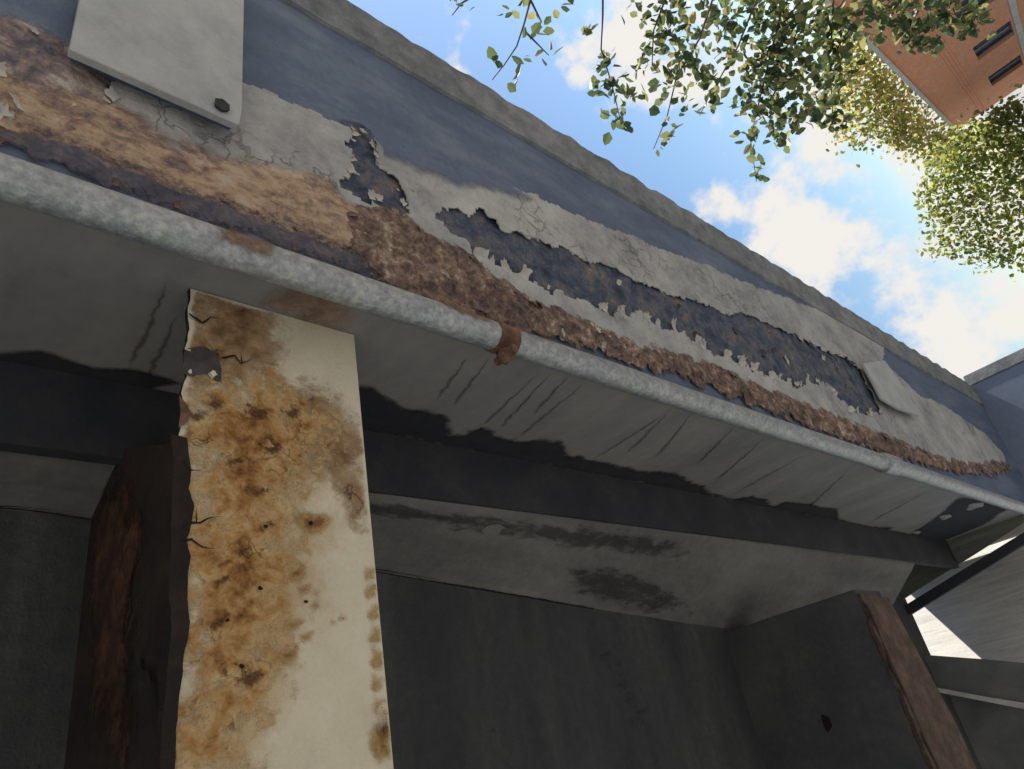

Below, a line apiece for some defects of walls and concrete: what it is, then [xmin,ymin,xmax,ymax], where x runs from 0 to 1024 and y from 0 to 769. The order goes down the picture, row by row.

peeling [0,90,32,131]
peeling [183,346,222,382]
peeling [339,120,529,217]
rust [0,14,1011,477]
peeling [435,208,882,417]
rust [160,290,367,769]
water stain [370,504,678,556]
rust [366,569,390,762]